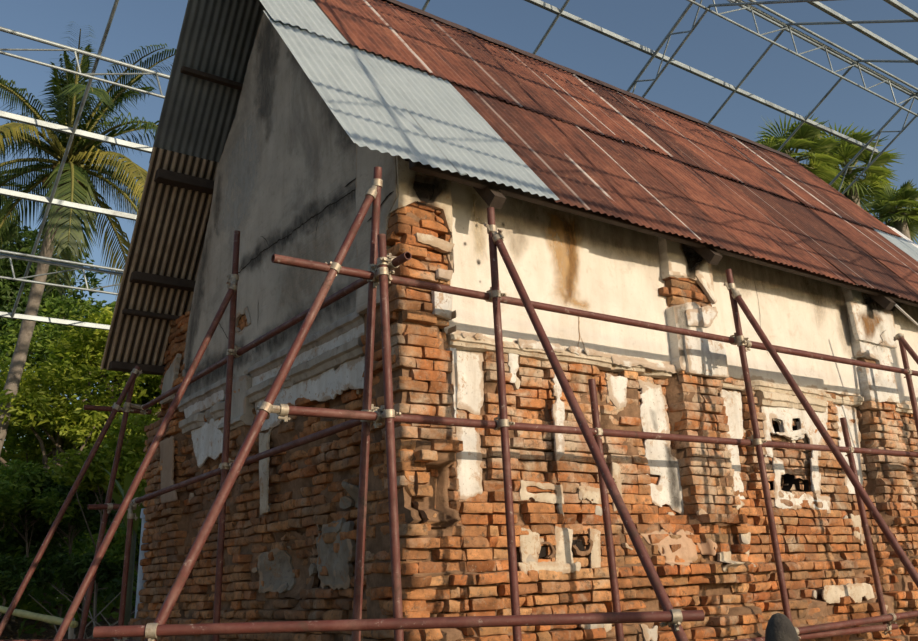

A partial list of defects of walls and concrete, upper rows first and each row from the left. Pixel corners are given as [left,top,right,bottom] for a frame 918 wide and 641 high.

water stain [258,20,276,117]
water stain [324,101,356,144]
crack [238,178,356,273]
flaking render [386,176,466,330]
rust [548,214,586,307]
flaking render [658,244,717,307]
peeling [385,347,484,528]
peeling [507,338,692,516]
peeling [719,389,746,510]
peeling [760,402,863,514]
peeling [517,526,601,574]
peeling [812,583,888,611]